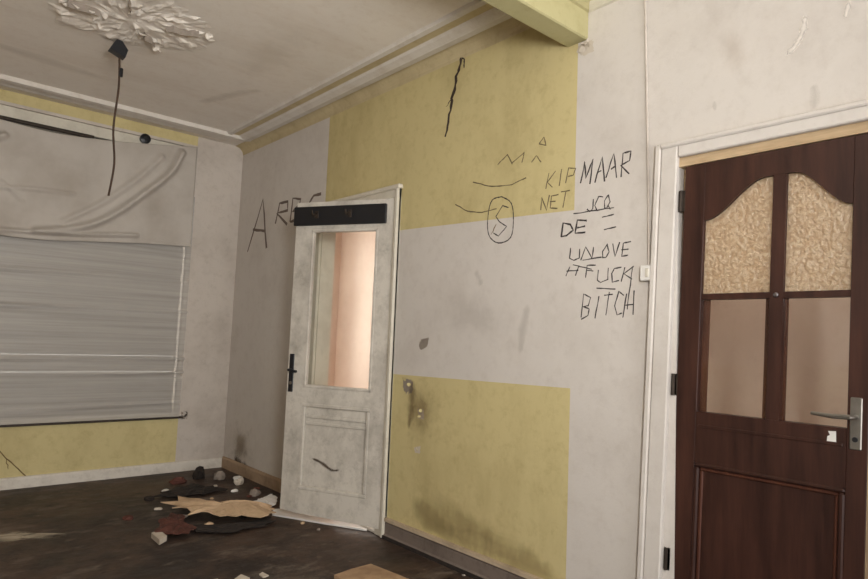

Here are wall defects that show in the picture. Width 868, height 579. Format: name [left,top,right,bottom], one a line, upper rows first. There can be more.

spalling [46,0,219,52]
crack [444,57,465,137]
crack [0,451,26,476]